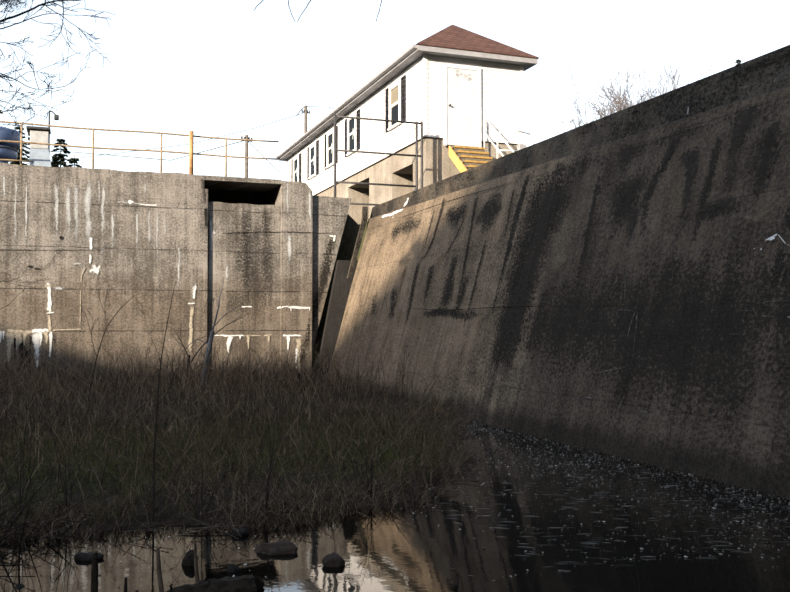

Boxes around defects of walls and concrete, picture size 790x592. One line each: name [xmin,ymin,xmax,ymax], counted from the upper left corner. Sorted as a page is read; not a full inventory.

damp [699,50,790,82]
efflorescence [14,183,28,236]
efflorescence [54,182,115,318]
efflorescence [117,200,166,257]
damp [382,98,790,423]
efflorescence [0,283,81,374]
damp [214,334,272,353]
damp [277,235,336,378]